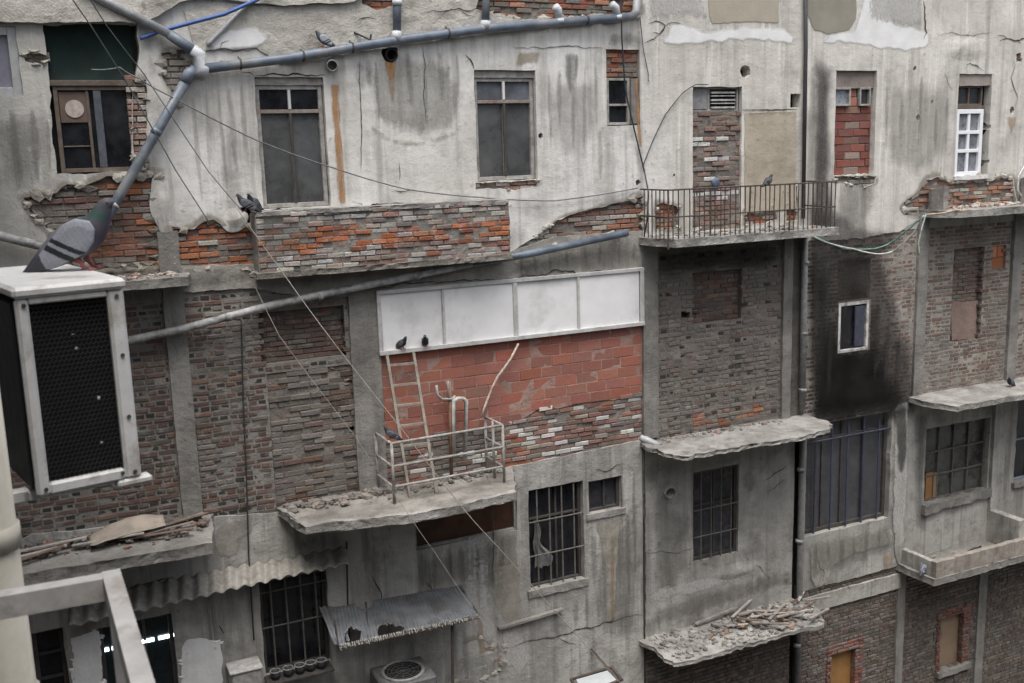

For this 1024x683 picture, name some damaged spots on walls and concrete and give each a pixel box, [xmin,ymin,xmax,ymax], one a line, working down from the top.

crack [645,20,681,43]
crack [924,5,1024,86]
crack [356,69,364,155]
rust [332,85,345,202]
spalling [20,75,253,274]
spalling [515,193,681,250]
spalling [899,172,1024,219]
peeling [69,629,107,683]
peeling [178,638,224,683]